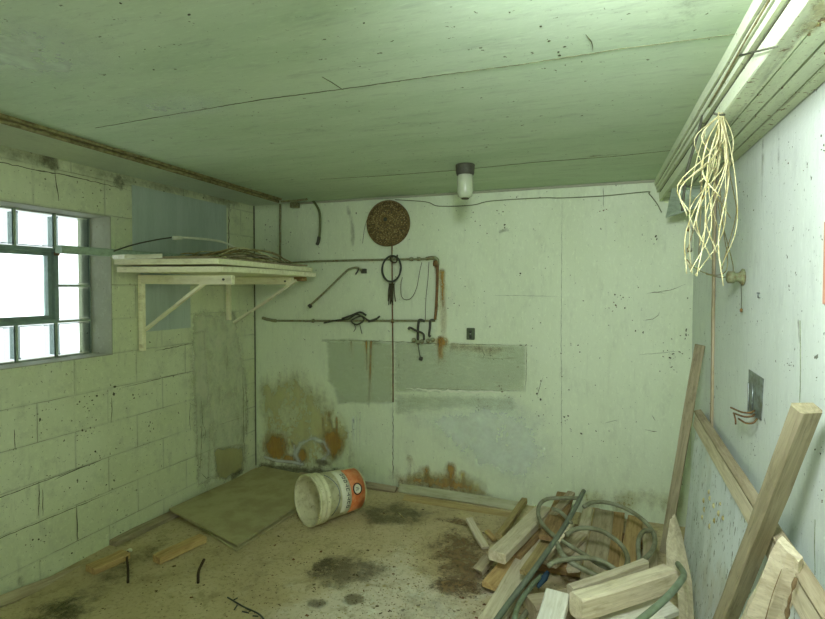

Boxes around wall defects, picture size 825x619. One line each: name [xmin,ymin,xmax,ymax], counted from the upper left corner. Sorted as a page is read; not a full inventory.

crack [0,162,124,201]
corrosion [265,435,307,463]
corrosion [322,413,344,457]
corrosion [401,464,483,493]
crack [0,460,107,539]